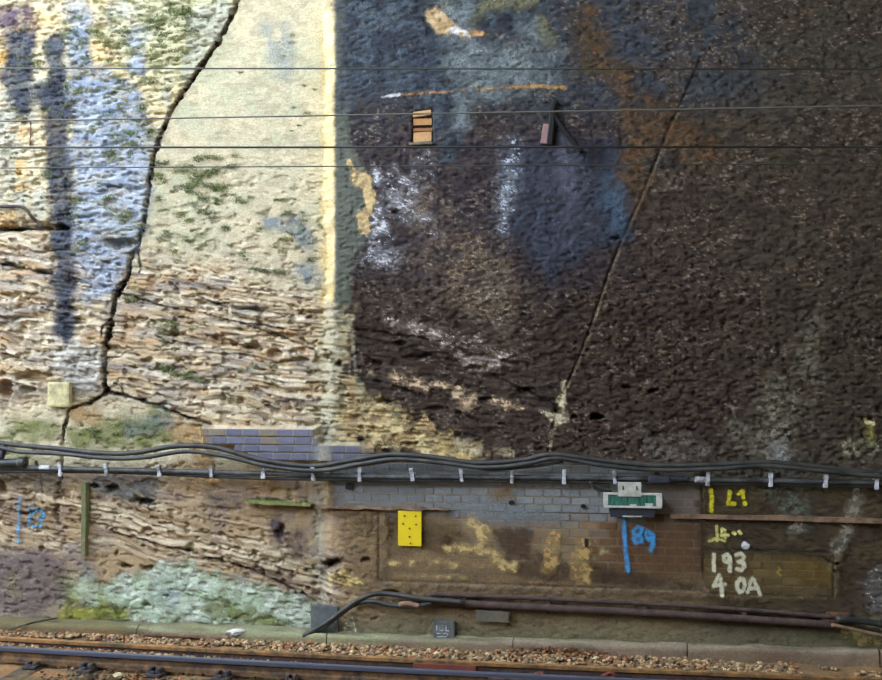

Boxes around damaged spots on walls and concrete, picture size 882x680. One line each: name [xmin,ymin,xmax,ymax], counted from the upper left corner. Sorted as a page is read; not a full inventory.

crack [0,0,313,440]
water stain [366,169,522,370]
water stain [150,561,195,609]
water stain [205,599,286,626]